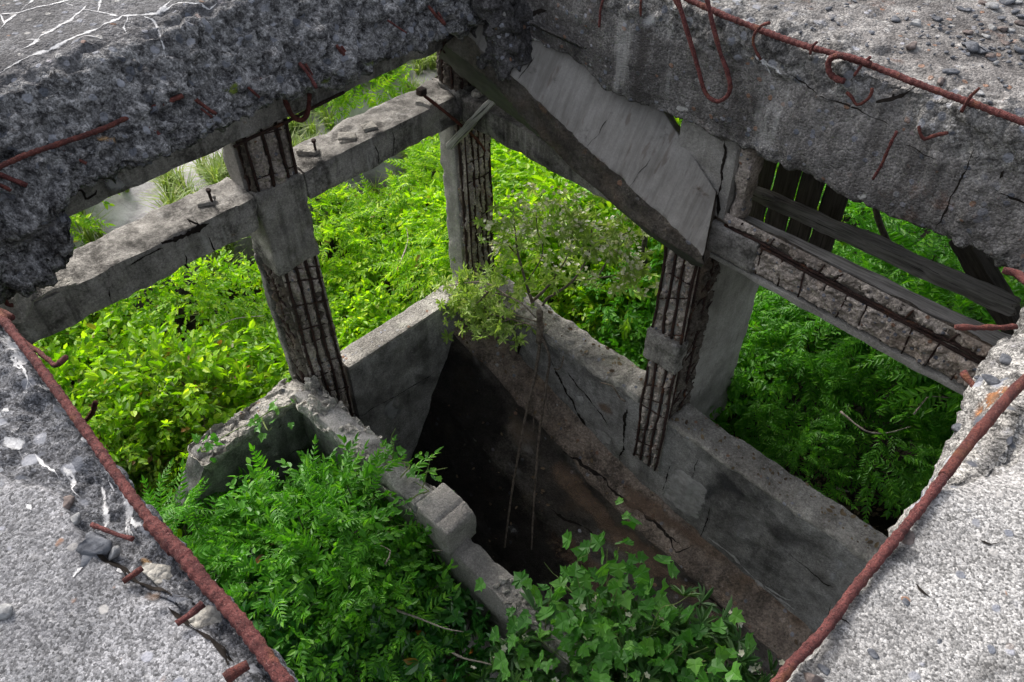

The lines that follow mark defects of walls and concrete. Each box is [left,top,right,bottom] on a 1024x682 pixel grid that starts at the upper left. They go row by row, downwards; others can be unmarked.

crack [0,0,216,73]
spalling [436,48,484,98]
spalling [235,118,319,193]
spalling [454,121,495,280]
crack [935,150,974,230]
crack [131,219,216,270]
spalling [262,255,355,417]
spalling [723,213,992,387]
spalling [633,246,721,519]
crack [551,362,710,553]
crack [795,559,851,625]